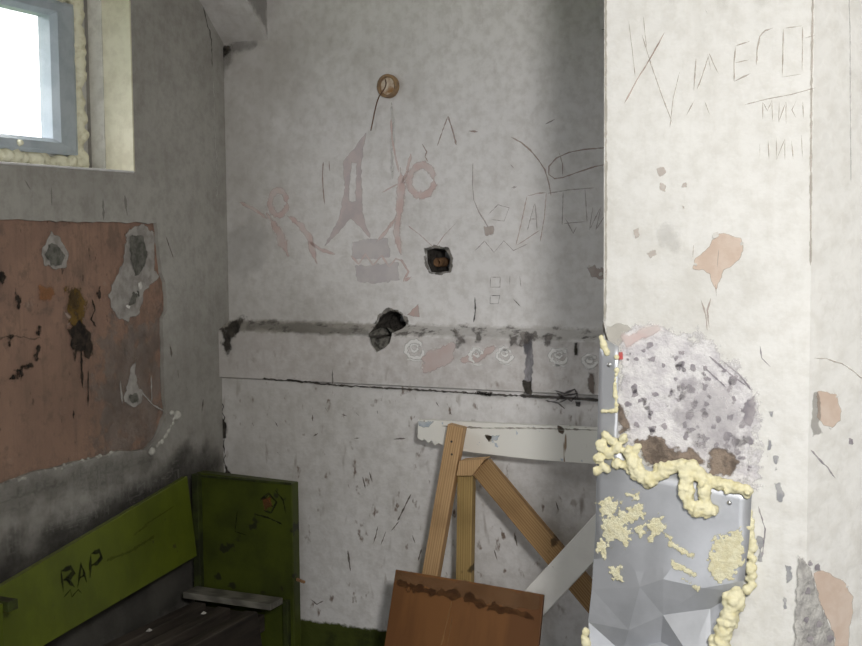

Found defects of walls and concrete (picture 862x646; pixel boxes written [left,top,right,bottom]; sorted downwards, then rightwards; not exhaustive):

spalling [424,245,453,275]
peeling [693,232,744,289]
flaking render [0,219,181,483]
spalling [368,305,419,352]
crack [263,371,598,402]
spalling [603,299,778,489]
spalling [817,391,841,429]
peeling [756,507,766,562]
spalling [783,558,853,646]